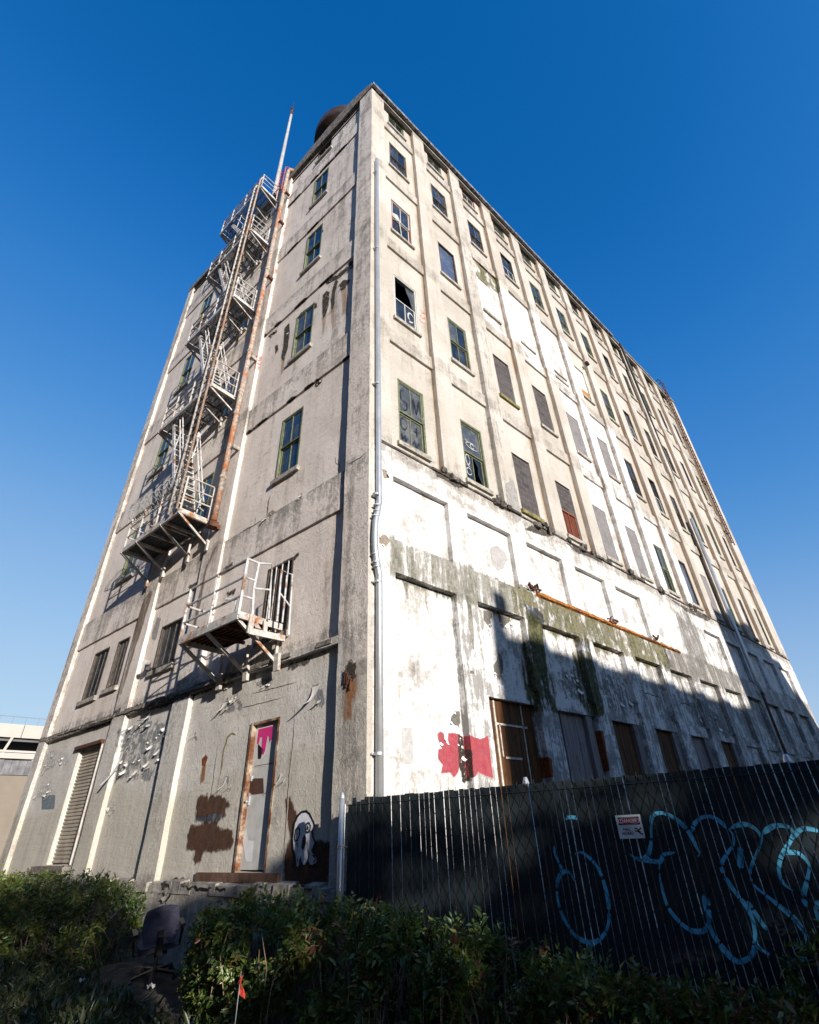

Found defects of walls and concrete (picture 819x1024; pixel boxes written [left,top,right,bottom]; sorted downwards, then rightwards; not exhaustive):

damp [466,589,486,649]
rust [343,659,357,718]
peeling [100,711,168,785]